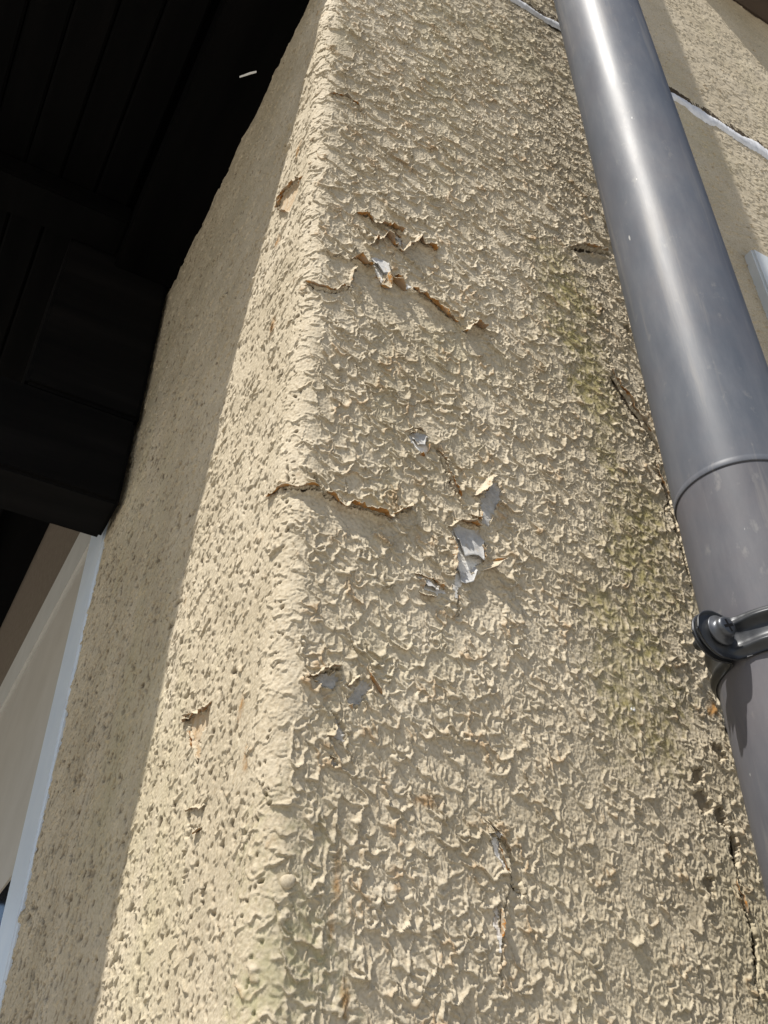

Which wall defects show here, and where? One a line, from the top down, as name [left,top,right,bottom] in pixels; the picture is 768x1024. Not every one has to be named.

peeling [351,211,459,322]
peeling [404,426,431,456]
peeling [415,474,508,604]
crack [658,461,686,570]
spalling [180,700,213,763]
peeling [326,718,345,765]
peeling [309,664,383,710]
crack [485,820,519,953]
crack [729,837,758,998]